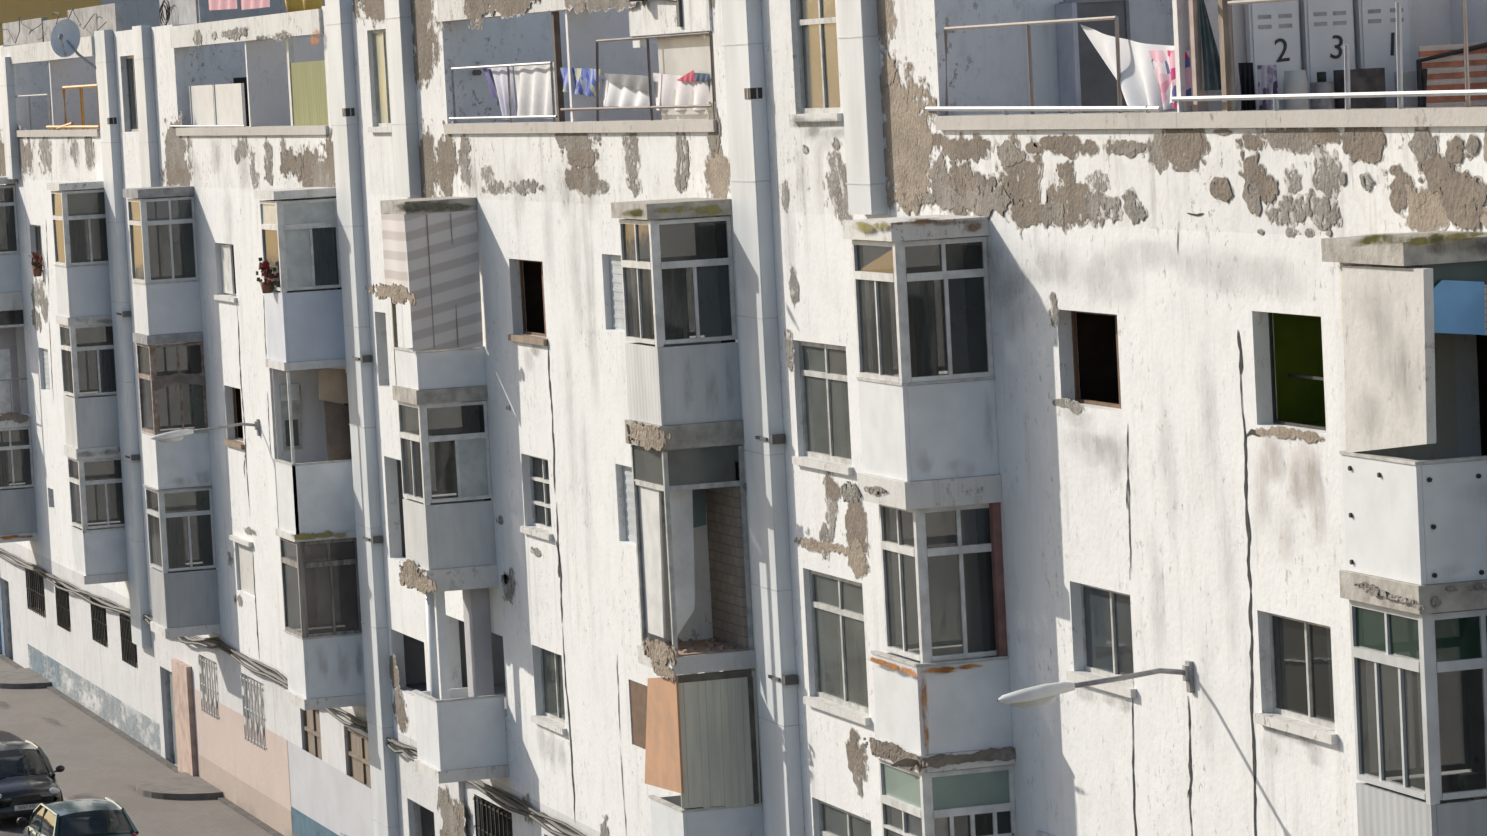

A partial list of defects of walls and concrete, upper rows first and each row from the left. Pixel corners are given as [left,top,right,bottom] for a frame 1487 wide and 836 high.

peeling [410,0,444,90]
peeling [160,111,193,186]
peeling [232,128,336,197]
peeling [418,113,545,198]
peeling [554,132,642,198]
peeling [674,101,731,217]
peeling [876,0,1487,239]
peeling [794,471,887,579]
crack [1237,331,1260,836]
corrosion [870,657,982,752]
spalling [844,727,1016,799]
peeling [437,784,471,836]